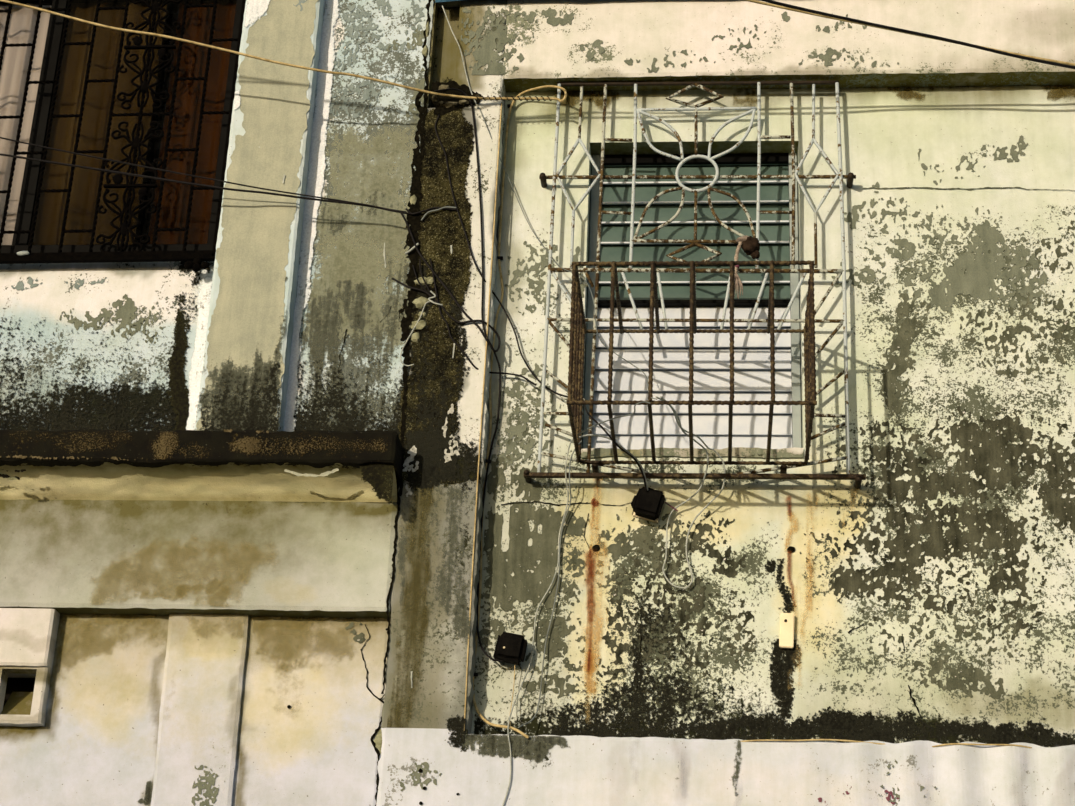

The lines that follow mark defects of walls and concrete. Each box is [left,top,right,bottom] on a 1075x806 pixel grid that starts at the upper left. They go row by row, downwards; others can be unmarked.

peeling [196,0,318,433]
peeling [329,0,574,137]
peeling [918,136,1028,185]
peeling [59,294,163,348]
damp [0,261,287,432]
damp [293,108,478,728]
crack [360,0,432,806]
peeling [787,182,1075,699]
rust [584,499,605,693]
damp [445,579,1075,796]
damp [765,558,796,618]
rust [785,496,798,596]